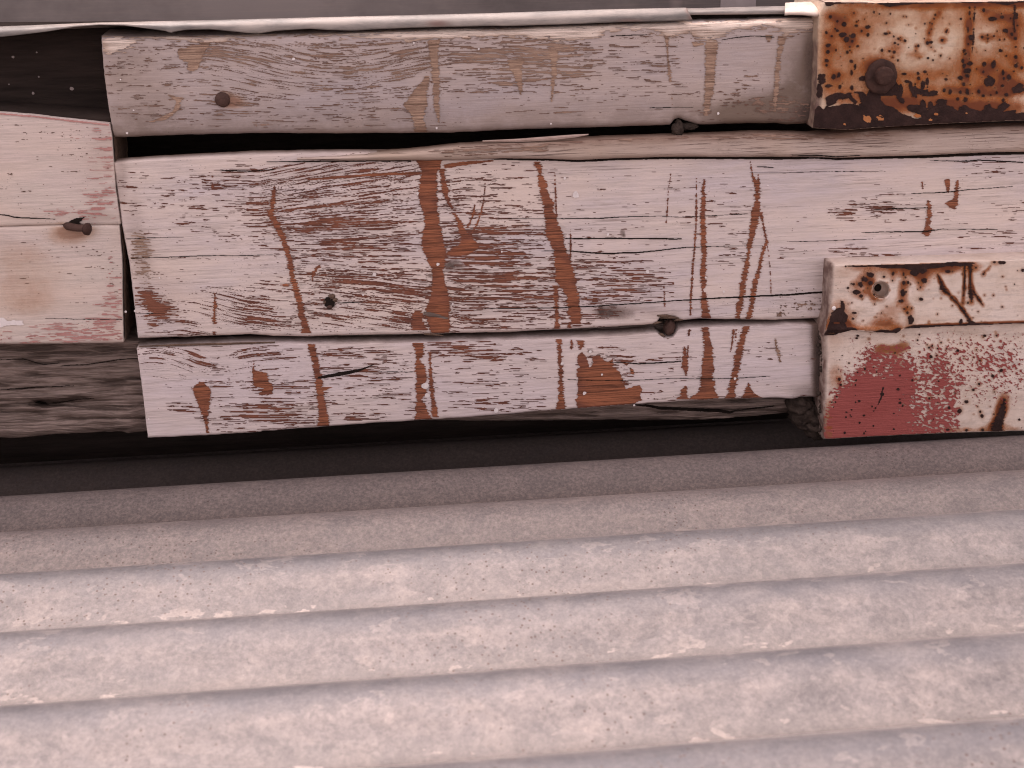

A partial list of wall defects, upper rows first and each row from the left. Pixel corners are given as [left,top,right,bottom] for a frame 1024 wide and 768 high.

peeling [104,33,842,140]
rust [813,1,1024,130]
peeling [0,113,820,433]
peeling [829,247,895,257]
peeling [828,157,1024,253]
crack [318,364,413,378]
crack [568,361,774,414]
peeling [803,332,1024,438]
rust [824,261,1024,435]